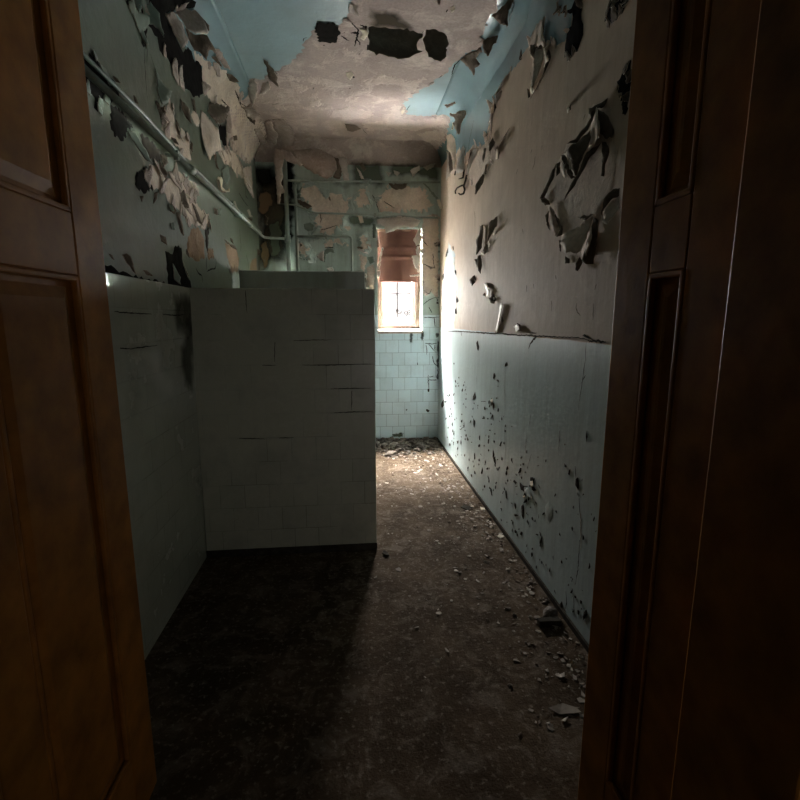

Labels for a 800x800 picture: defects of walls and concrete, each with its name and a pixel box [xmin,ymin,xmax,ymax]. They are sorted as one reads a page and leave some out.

leakage [176,299,192,384]
peeling [84,0,583,288]
peeling [292,179,458,332]
peeling [470,216,504,332]
peeling [540,97,621,271]
flaking render [604,0,629,28]
flaking render [617,60,632,115]
peeling [441,377,545,538]